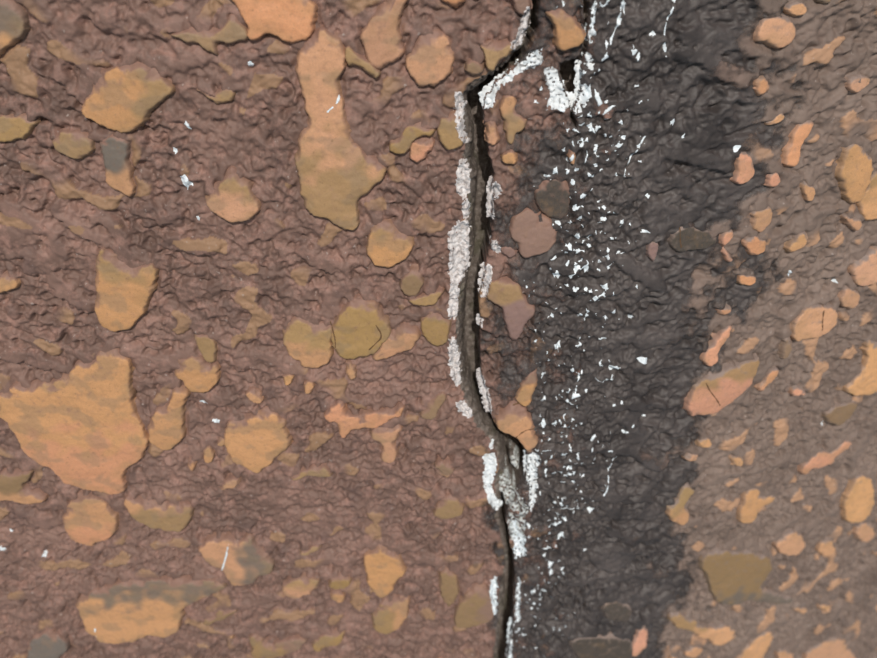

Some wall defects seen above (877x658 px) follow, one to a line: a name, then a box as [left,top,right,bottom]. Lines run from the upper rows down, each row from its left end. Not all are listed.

crack [447,0,538,658]
crack [559,0,597,126]
leakage [478,0,797,658]